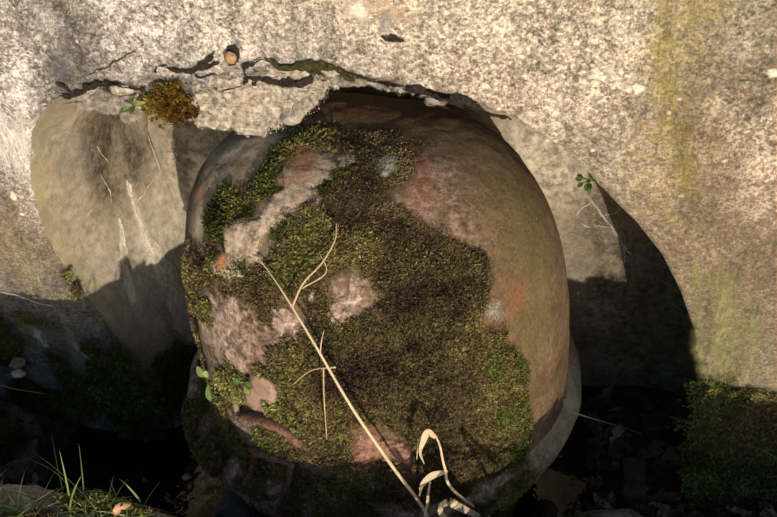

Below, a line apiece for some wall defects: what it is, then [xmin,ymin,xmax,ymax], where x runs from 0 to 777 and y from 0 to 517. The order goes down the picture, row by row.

spalling [65,83,142,126]
crack [55,51,512,120]
peeling [167,138,177,170]